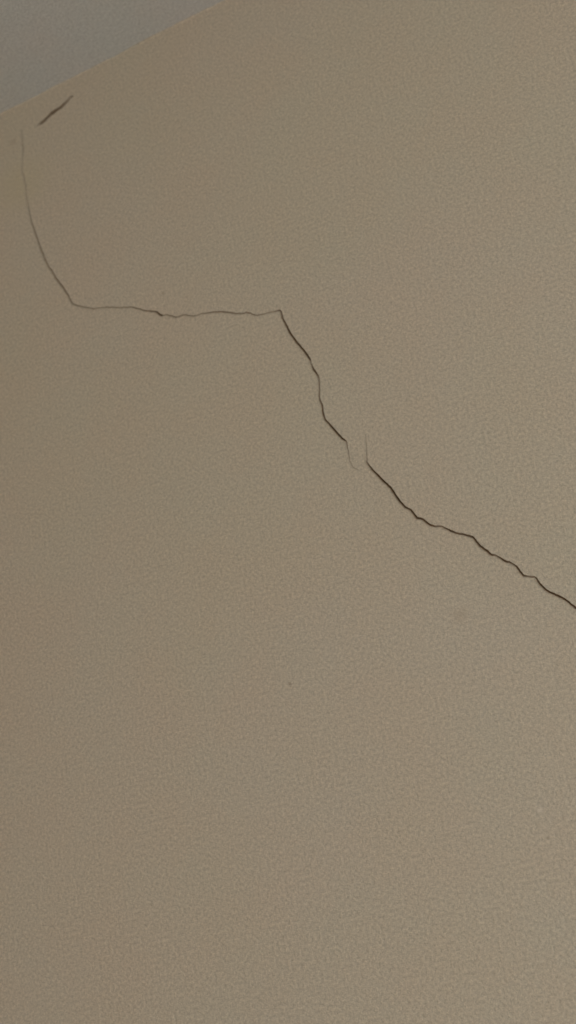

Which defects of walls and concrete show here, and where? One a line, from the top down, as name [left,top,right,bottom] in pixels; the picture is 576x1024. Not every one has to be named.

crack [20,95,576,611]